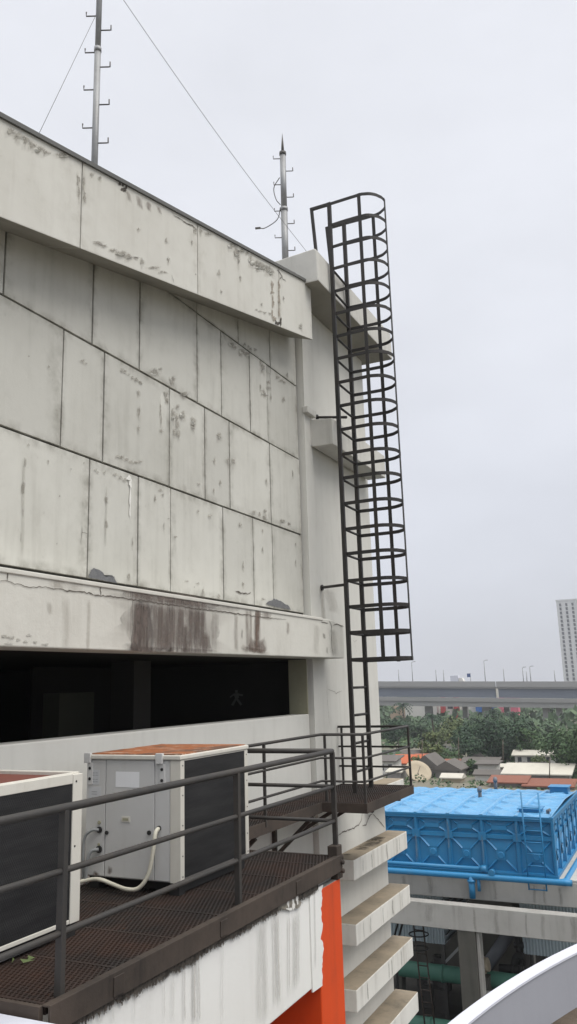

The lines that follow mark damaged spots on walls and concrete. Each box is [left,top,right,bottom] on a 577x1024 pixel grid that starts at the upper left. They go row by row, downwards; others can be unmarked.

peeling [94,241,170,273]
spalling [88,568,137,585]
crack [3,573,283,620]
spalling [262,598,291,610]
rust [252,611,265,652]